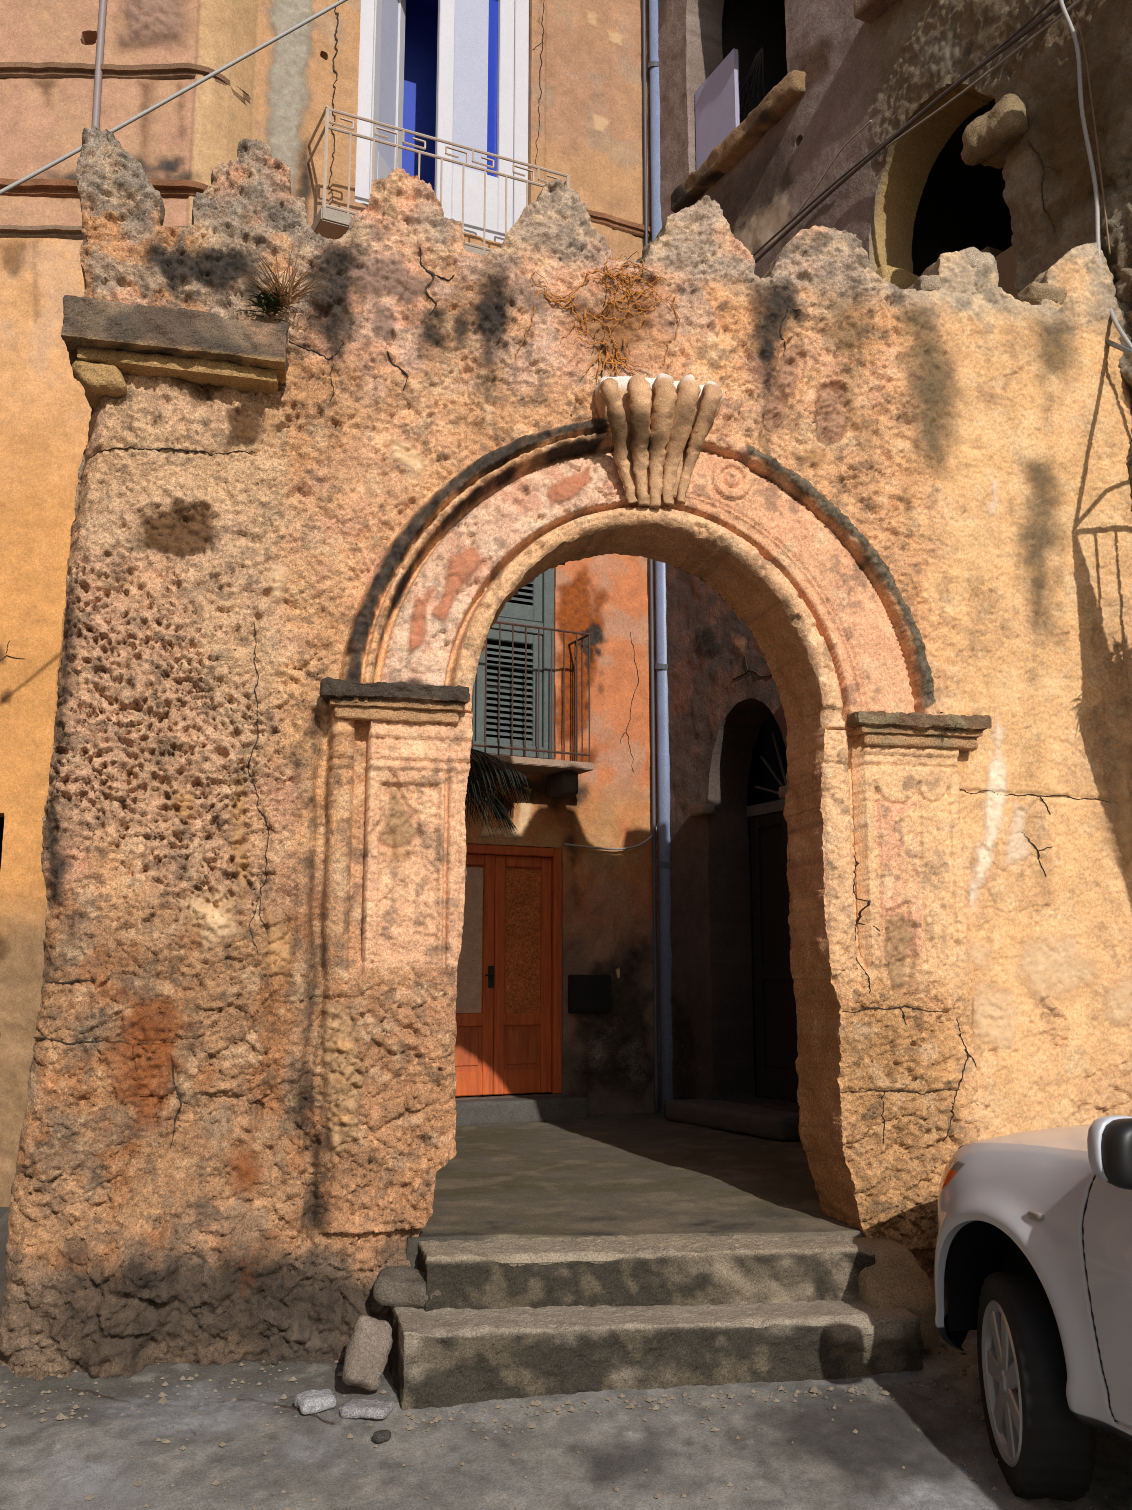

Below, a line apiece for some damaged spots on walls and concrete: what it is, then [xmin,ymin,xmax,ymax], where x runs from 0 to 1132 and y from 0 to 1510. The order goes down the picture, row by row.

crack [328,0,339,201]
crack [419,247,454,315]
leakage [1023,462,1057,607]
crack [233,623,274,964]
efflorescence [970,723,1027,904]
crack [961,789,1113,877]
crack [845,856,977,1143]
leakage [64,1259,373,1373]